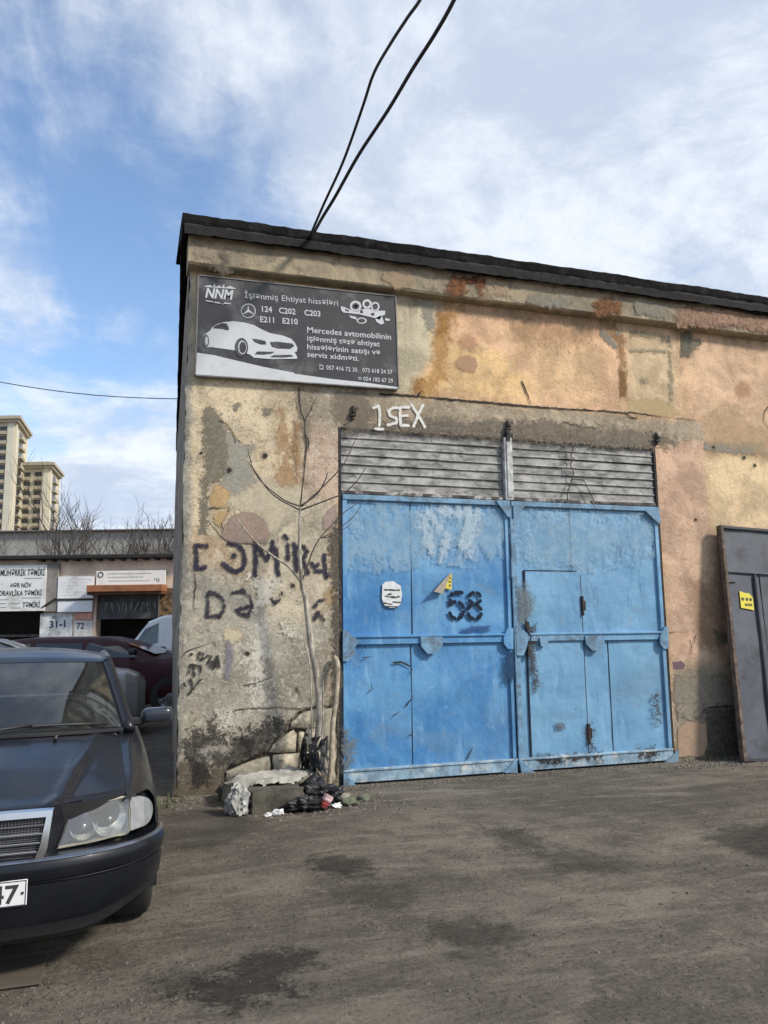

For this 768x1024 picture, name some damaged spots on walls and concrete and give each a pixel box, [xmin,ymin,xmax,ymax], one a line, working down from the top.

rust [414,272,487,399]
spalling [461,285,574,320]
rust [591,295,628,397]
spalling [599,300,768,421]
peeling [197,403,306,544]
rust [502,580,542,694]
damp [169,713,293,796]